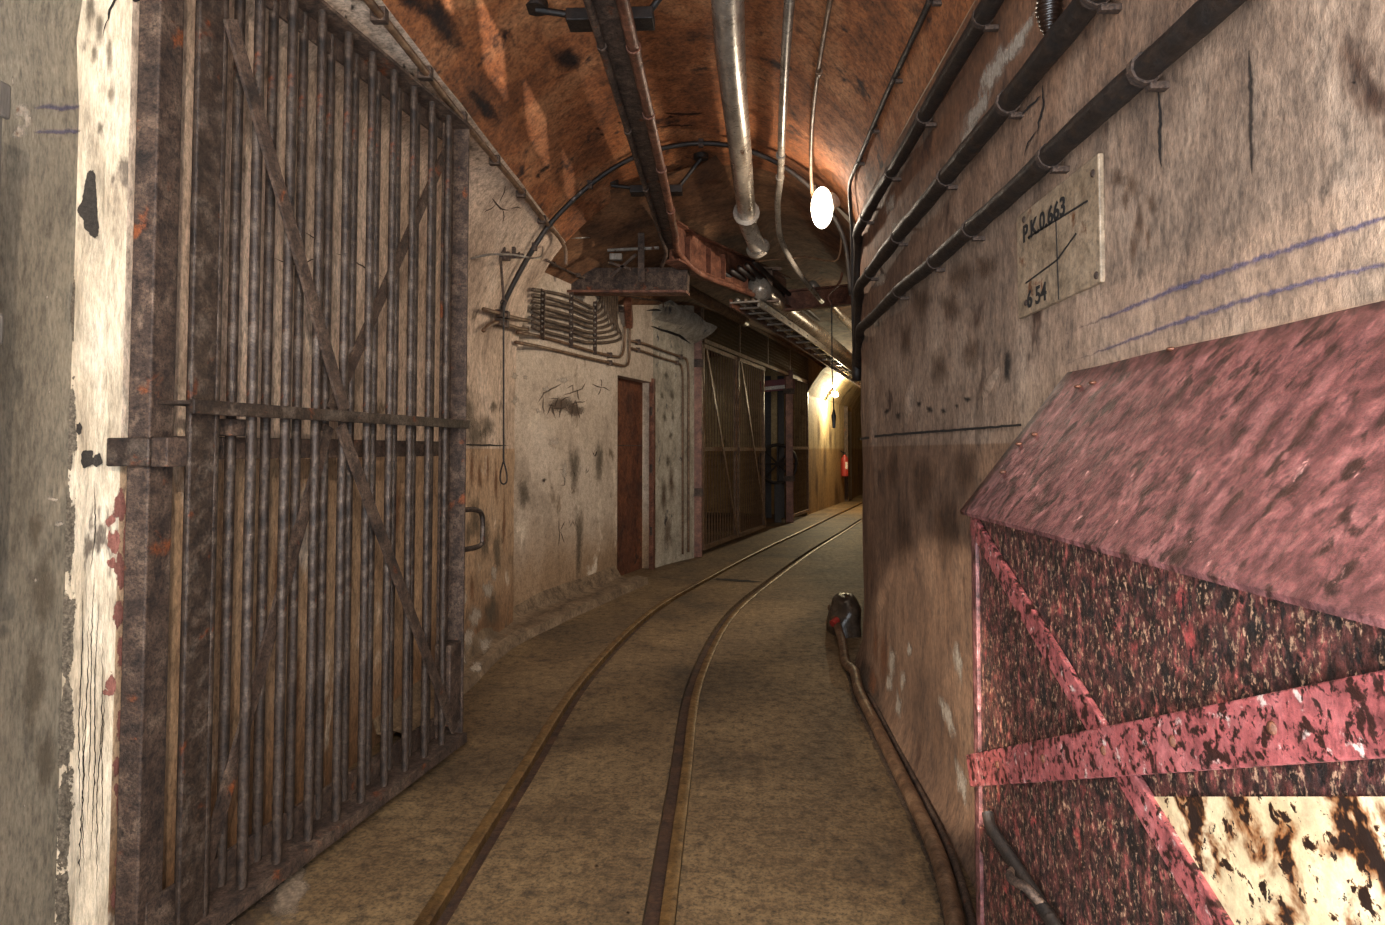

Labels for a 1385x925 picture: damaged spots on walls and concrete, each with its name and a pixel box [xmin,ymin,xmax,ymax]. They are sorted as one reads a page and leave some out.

flaking render [54,376,103,925]
peeling [103,488,126,817]